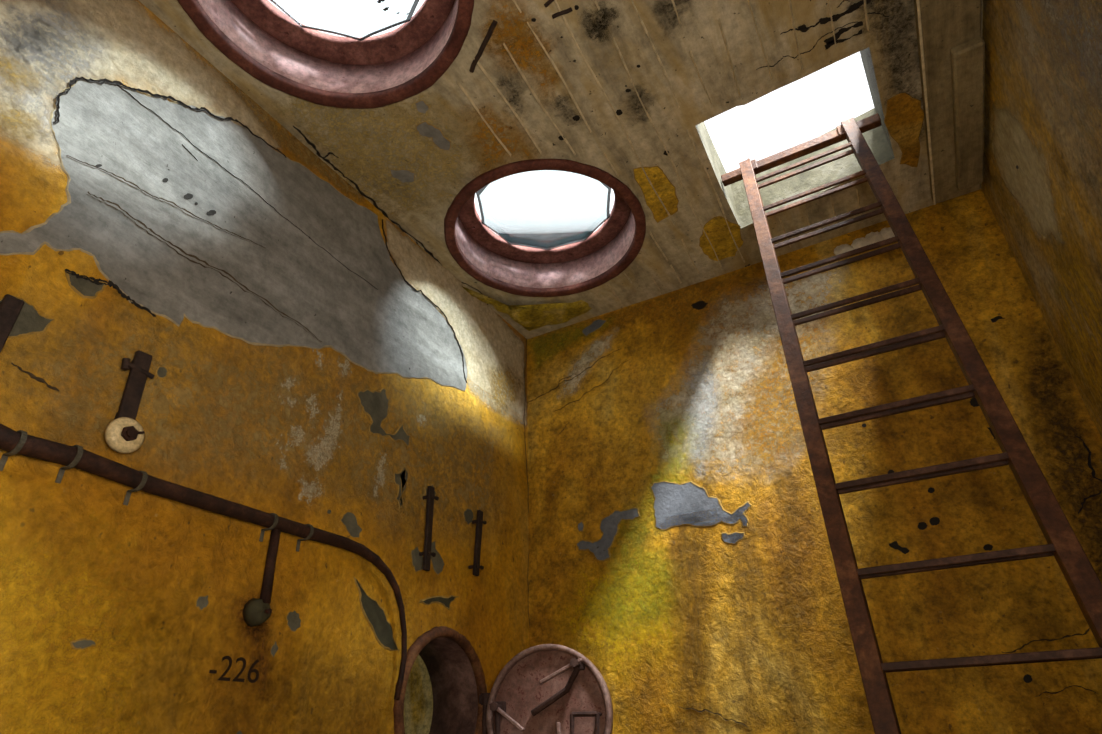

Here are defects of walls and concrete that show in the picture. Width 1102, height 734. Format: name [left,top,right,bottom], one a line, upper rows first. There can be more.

spalling [544,0,579,19]
peeling [0,0,527,425]
peeling [276,377,343,503]
peeling [357,388,410,447]
peeling [372,454,409,510]
peeling [411,541,445,575]
peeling [576,507,641,562]
peeling [650,481,752,545]
crack [1075,435,1102,514]
peeling [354,577,398,651]